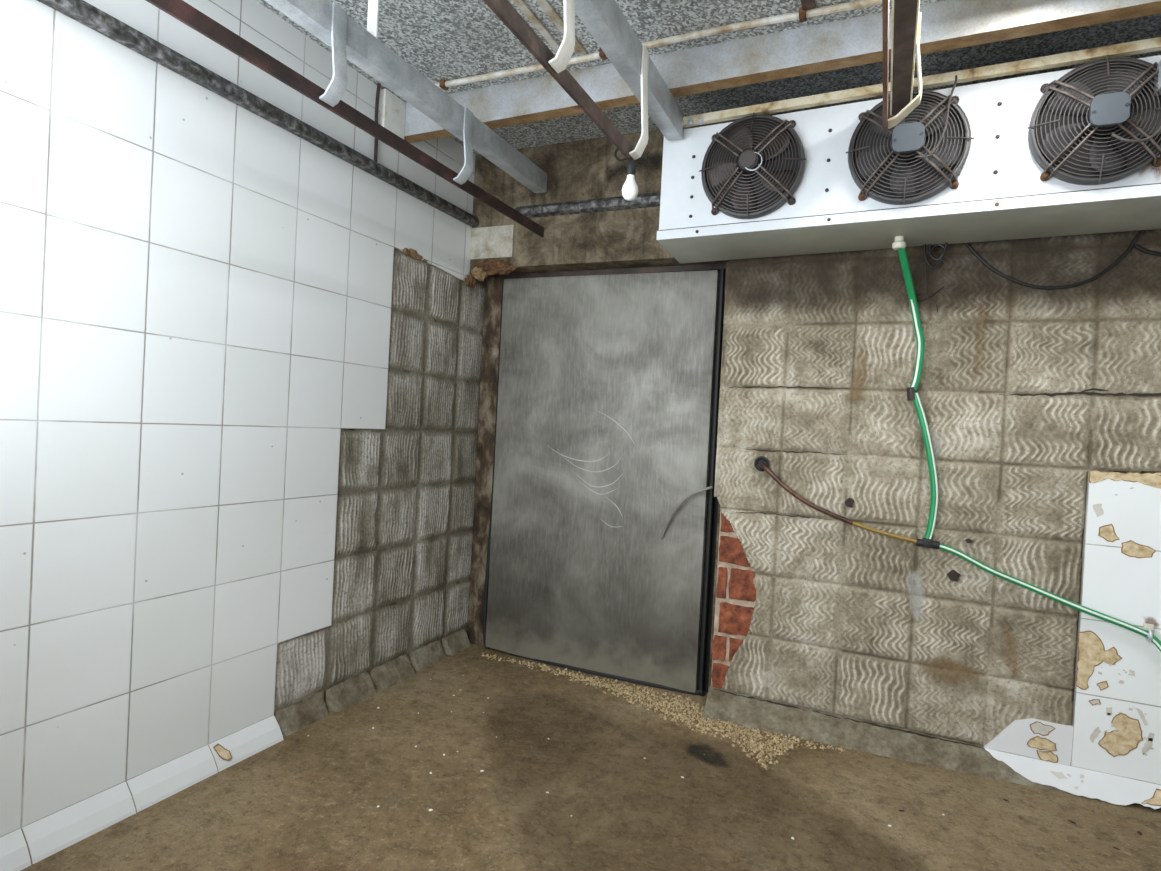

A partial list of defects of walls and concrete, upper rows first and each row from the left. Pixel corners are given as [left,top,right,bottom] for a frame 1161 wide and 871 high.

peeling [274,248,518,712]
peeling [711,234,1161,790]
water stain [688,745,726,766]
spalling [1141,788,1161,806]